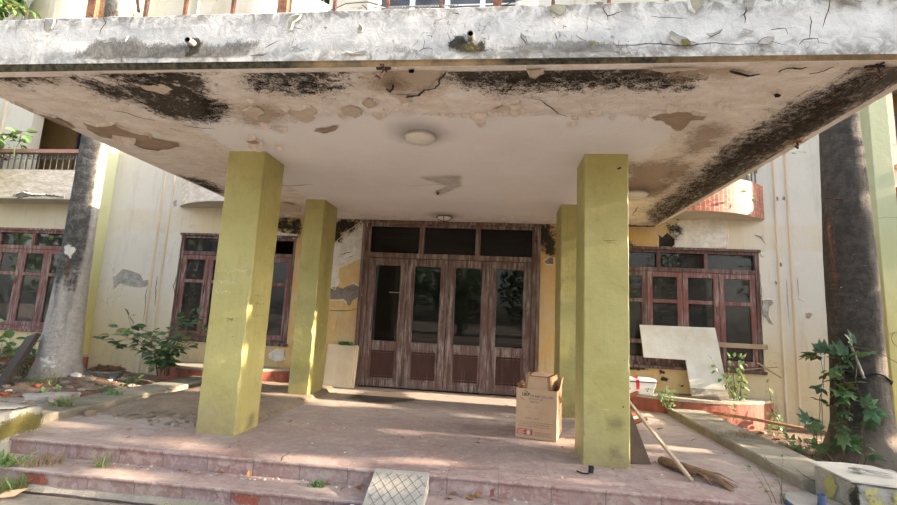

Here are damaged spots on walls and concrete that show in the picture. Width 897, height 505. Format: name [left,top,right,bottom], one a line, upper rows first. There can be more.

crack [617,1,830,46]
peeling [9,100,179,151]
mould [0,72,361,125]
peeling [275,97,399,134]
crack [406,72,446,98]
mould [437,67,714,101]
peeling [639,102,735,153]
crack [729,67,833,77]
water stain [628,65,897,242]
flaking render [112,268,149,291]
flaking render [330,221,368,306]